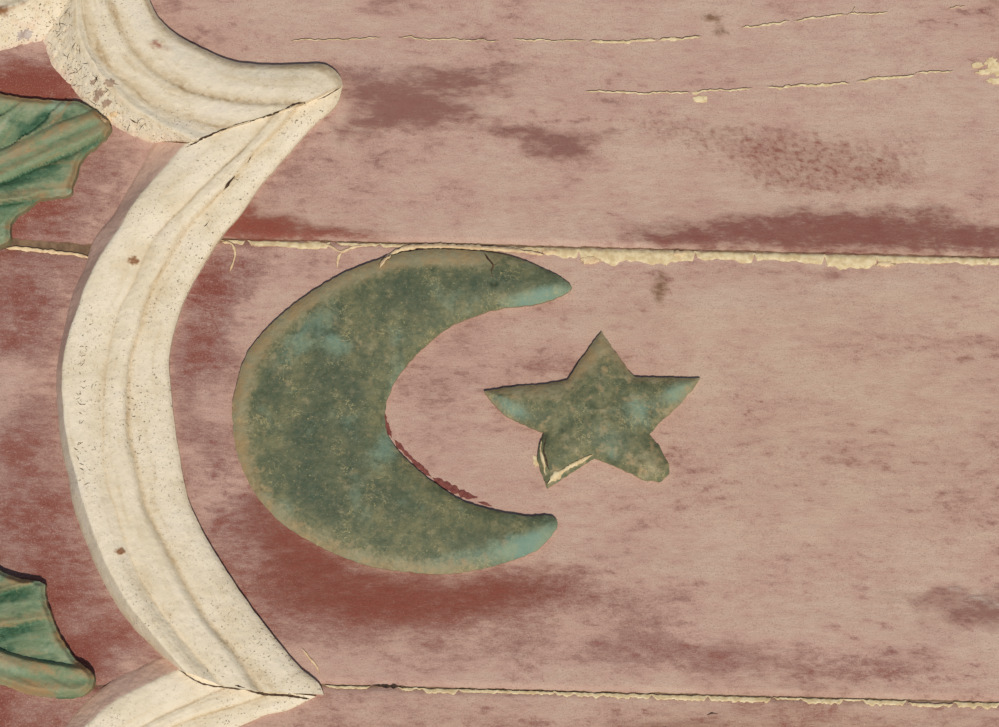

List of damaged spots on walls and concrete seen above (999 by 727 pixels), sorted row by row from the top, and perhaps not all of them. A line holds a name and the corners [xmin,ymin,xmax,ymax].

crack [743,7,887,28]
crack [293,35,699,44]
peeling [971,57,999,84]
crack [586,70,952,103]
peeling [221,240,999,270]
peeling [398,687,999,715]